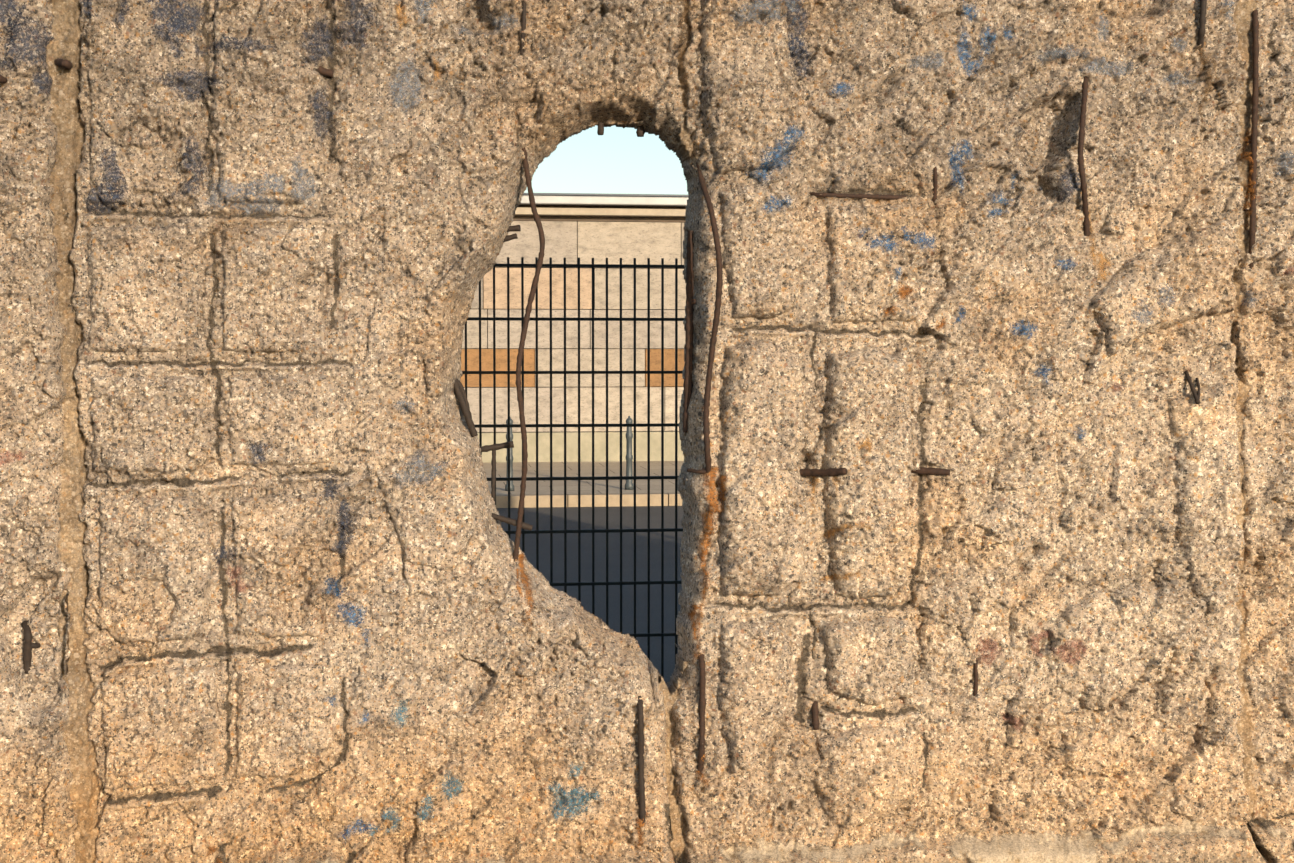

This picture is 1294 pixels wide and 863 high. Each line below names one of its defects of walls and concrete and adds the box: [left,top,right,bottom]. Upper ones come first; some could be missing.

spalling [512,91,549,153]
rust [1240,130,1256,229]
crack [66,0,357,805]
rust [688,467,727,657]
crack [1246,813,1294,862]